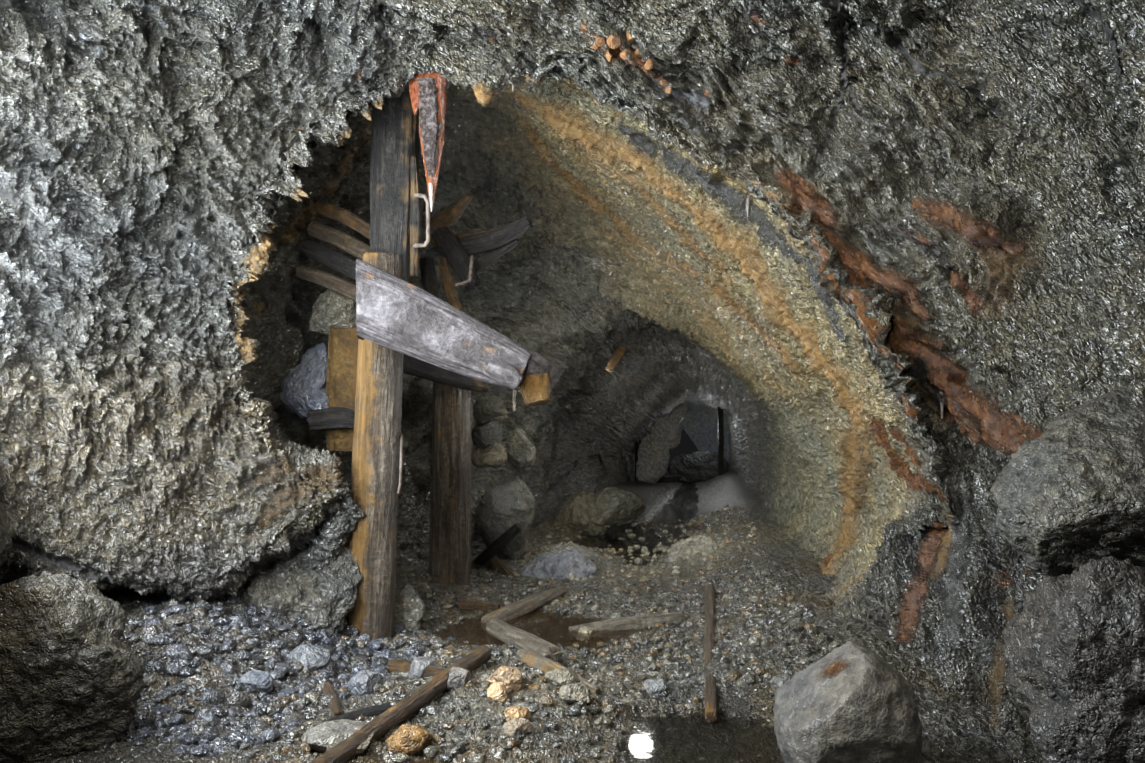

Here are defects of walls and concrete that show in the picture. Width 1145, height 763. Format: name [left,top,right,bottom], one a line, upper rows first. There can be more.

corrosion [473,74,955,644]
corrosion [742,168,1044,455]